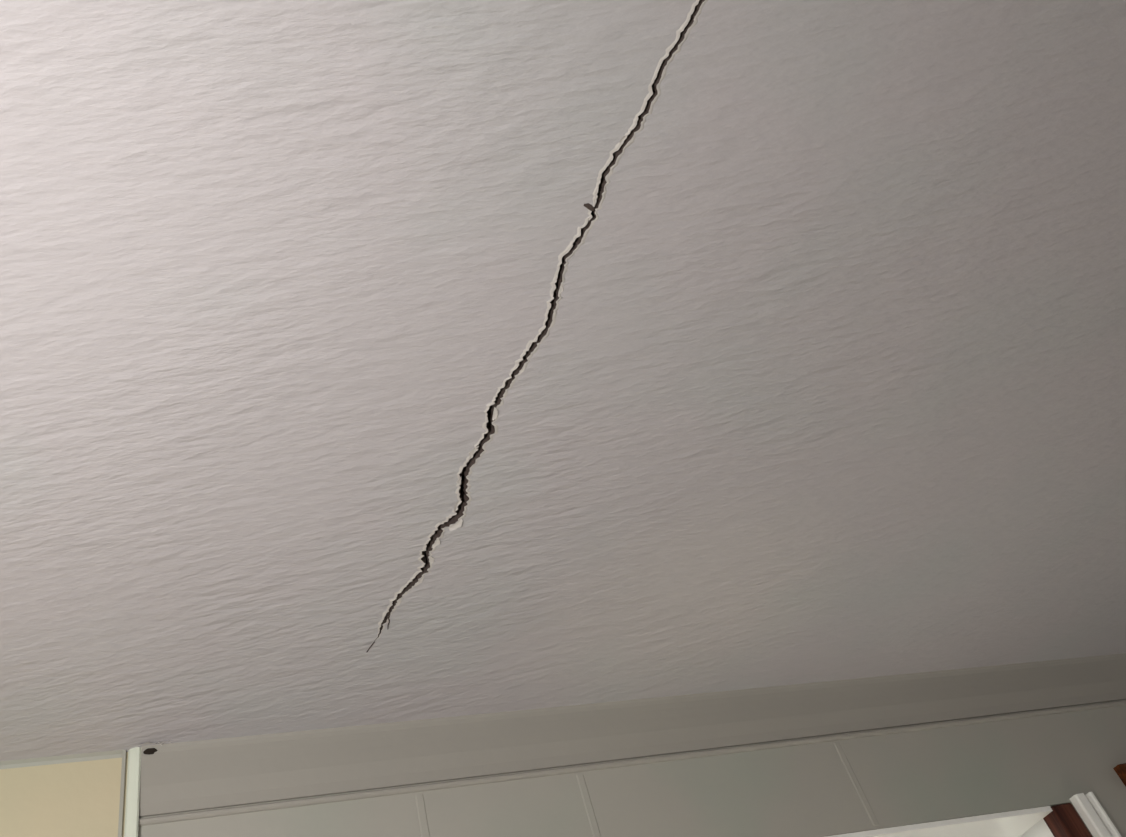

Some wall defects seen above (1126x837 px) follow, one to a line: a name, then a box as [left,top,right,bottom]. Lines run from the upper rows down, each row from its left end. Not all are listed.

crack [367,0,708,652]